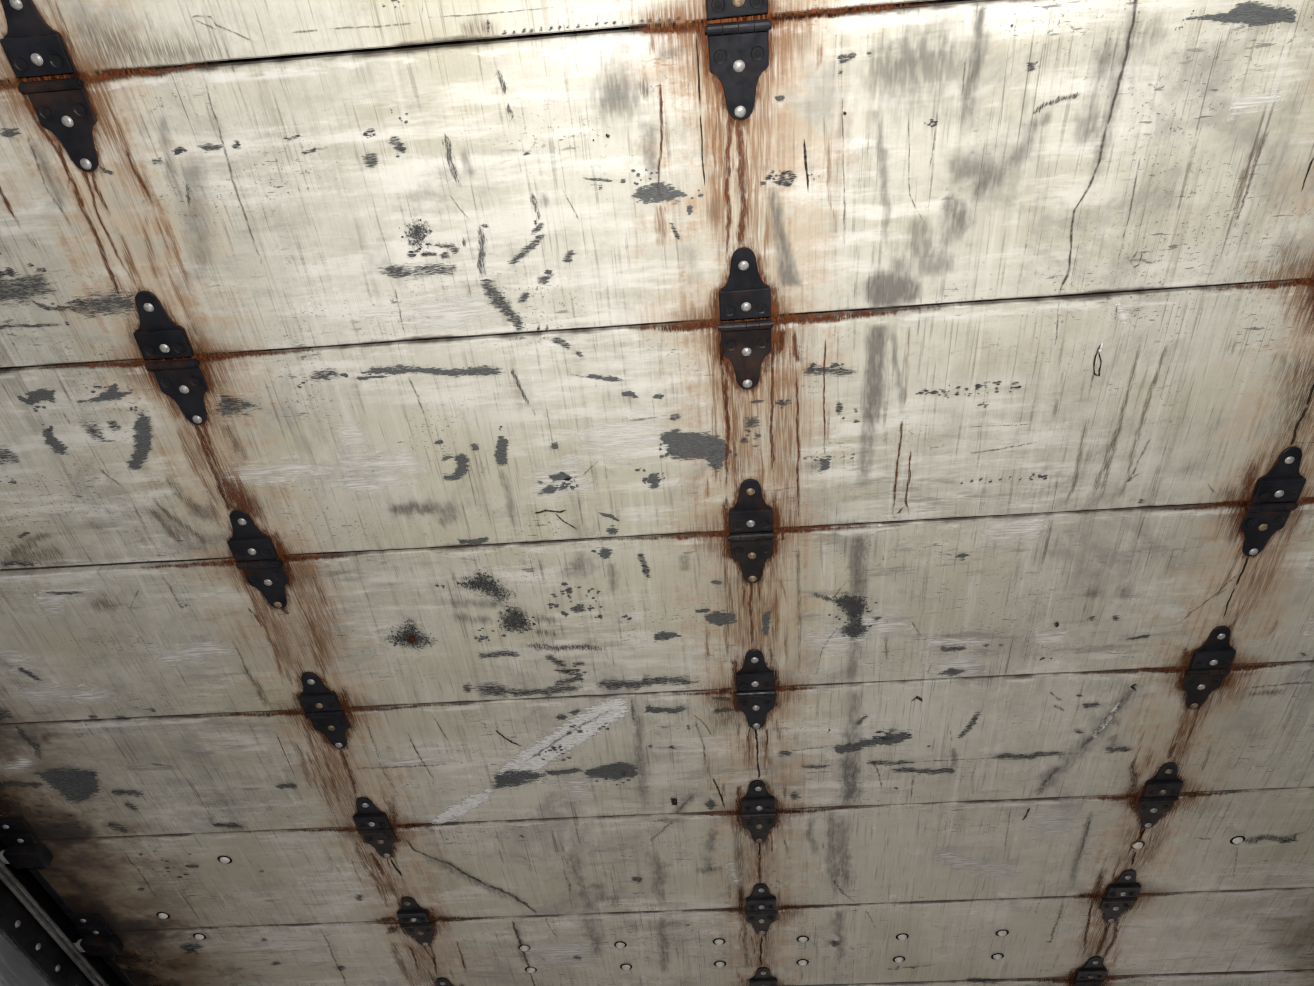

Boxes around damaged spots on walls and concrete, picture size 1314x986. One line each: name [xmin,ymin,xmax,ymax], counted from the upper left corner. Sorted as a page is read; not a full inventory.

corrosion [0,4,504,986]
corrosion [619,0,927,751]
corrosion [1175,369,1314,591]
corrosion [1219,253,1314,315]
corrosion [697,780,879,986]
corrosion [1008,620,1289,986]